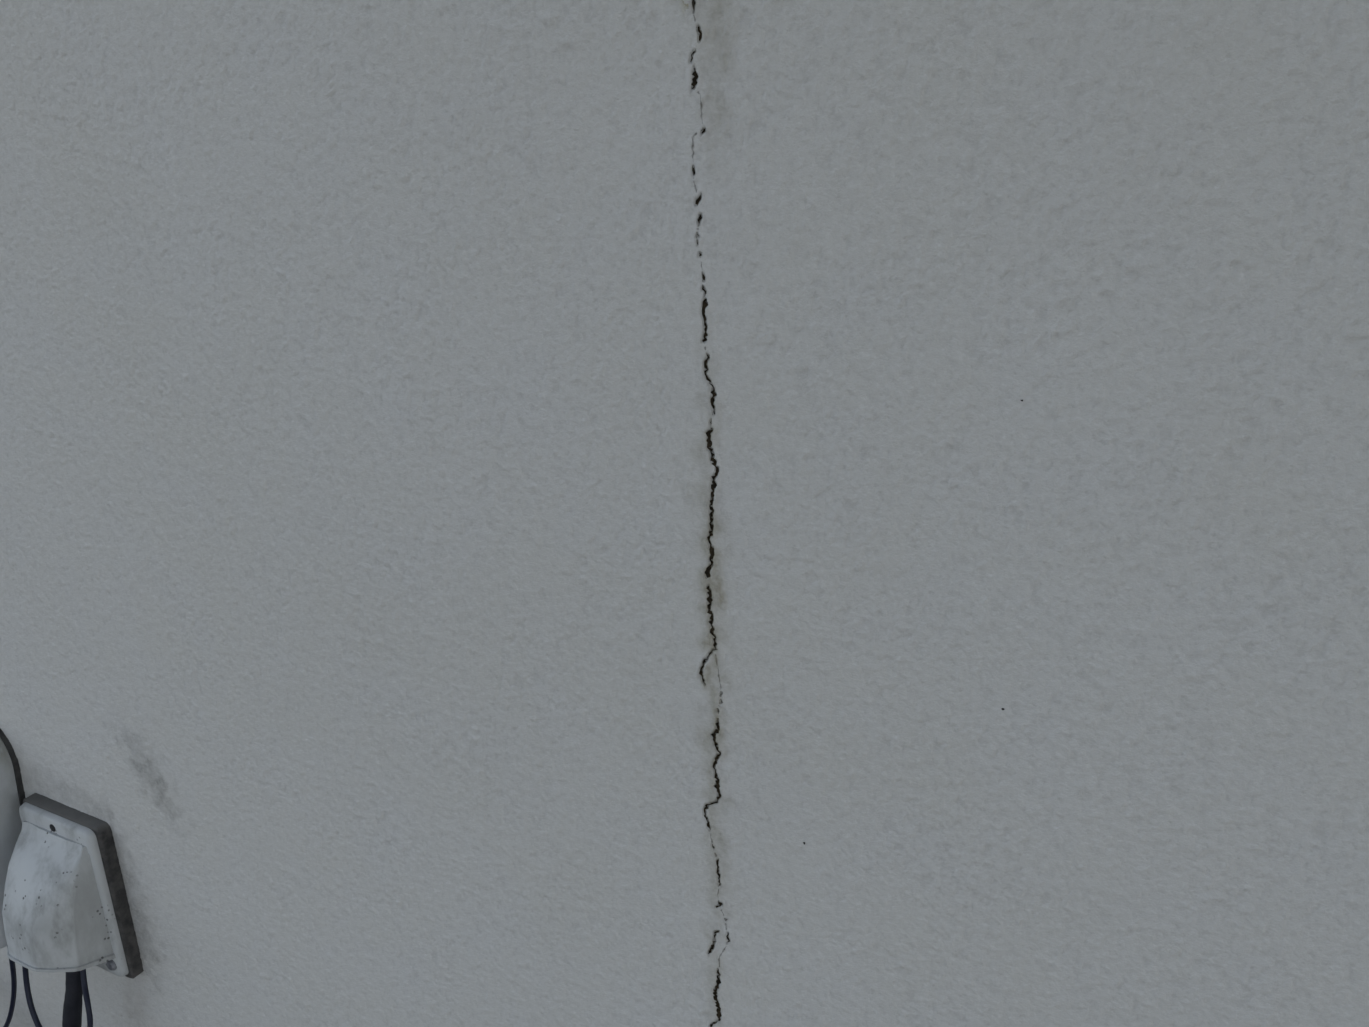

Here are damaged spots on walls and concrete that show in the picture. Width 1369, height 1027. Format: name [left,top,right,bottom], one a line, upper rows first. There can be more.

crack [687,0,730,1027]